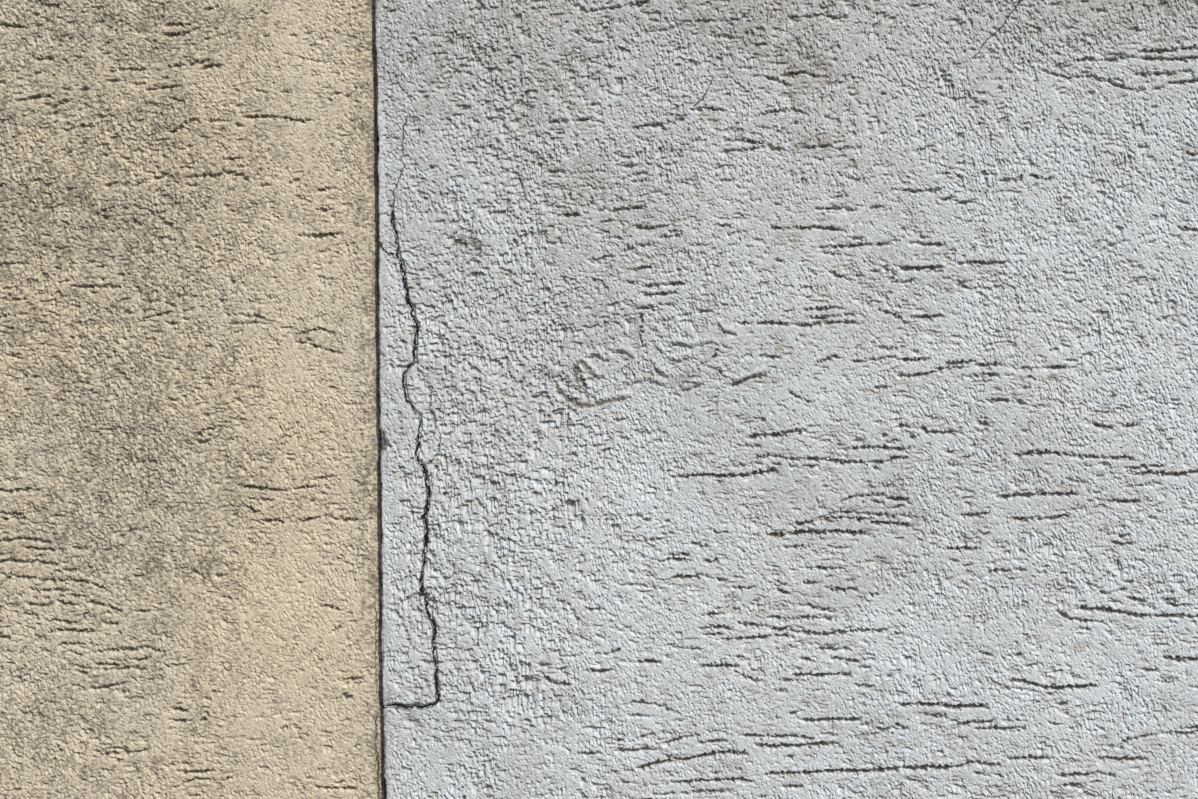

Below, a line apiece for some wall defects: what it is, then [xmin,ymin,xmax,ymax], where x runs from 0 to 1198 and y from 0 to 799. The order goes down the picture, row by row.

crack [374,114,441,799]